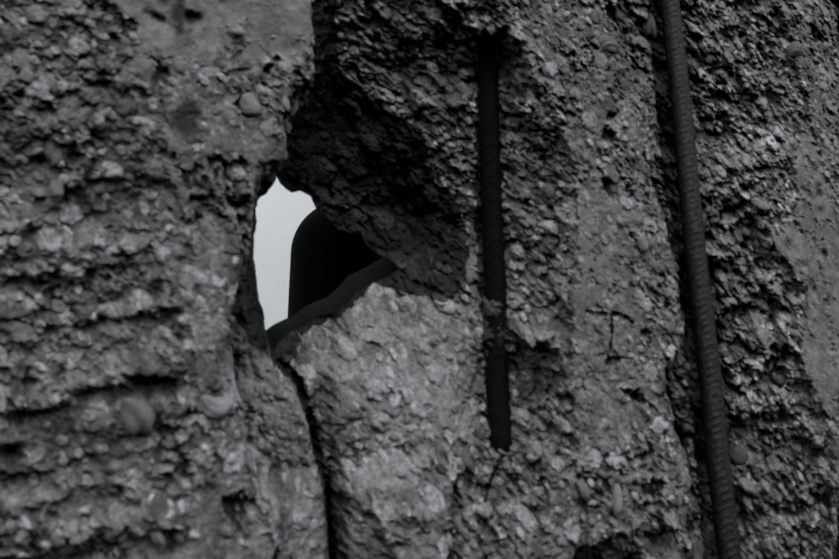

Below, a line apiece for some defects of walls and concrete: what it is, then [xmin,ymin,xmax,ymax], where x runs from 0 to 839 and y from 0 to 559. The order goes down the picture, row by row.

spalling [0,0,513,559]
spalling [489,0,743,559]
spalling [691,0,839,439]